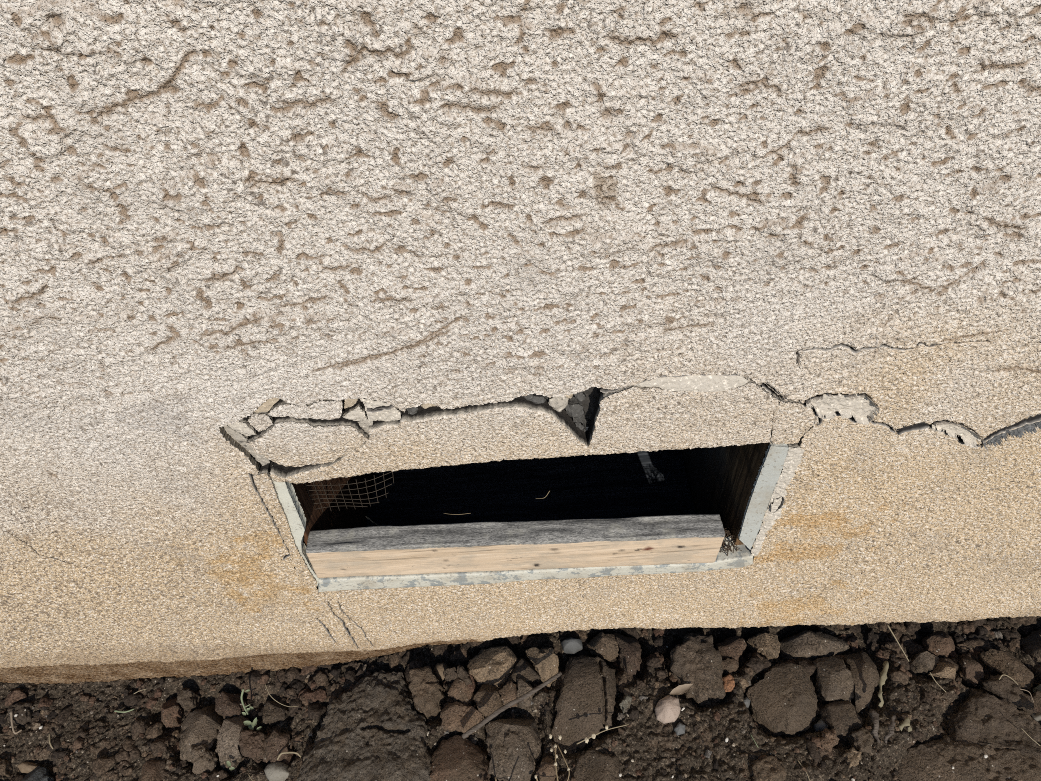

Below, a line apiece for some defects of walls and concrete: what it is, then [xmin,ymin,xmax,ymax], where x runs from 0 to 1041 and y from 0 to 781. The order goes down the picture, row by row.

spalling [223,398,436,467]
spalling [524,387,599,432]
crack [600,373,1041,451]
crack [248,474,290,561]
crack [316,601,374,649]